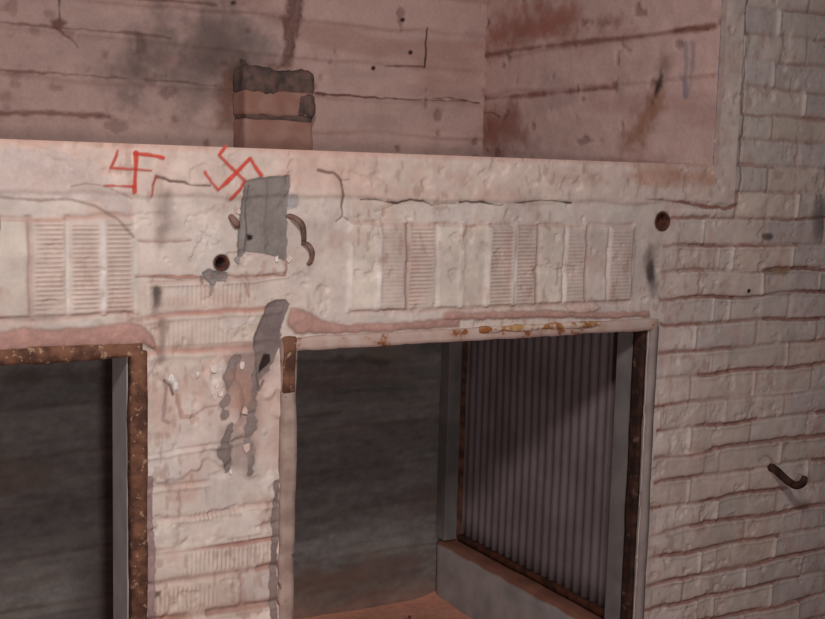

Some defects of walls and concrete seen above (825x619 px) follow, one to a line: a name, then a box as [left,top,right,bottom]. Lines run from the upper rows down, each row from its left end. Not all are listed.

crack [317,169,423,221]
flaking render [189,299,289,476]
corrosion [478,321,600,334]
flaking render [268,480,280,619]